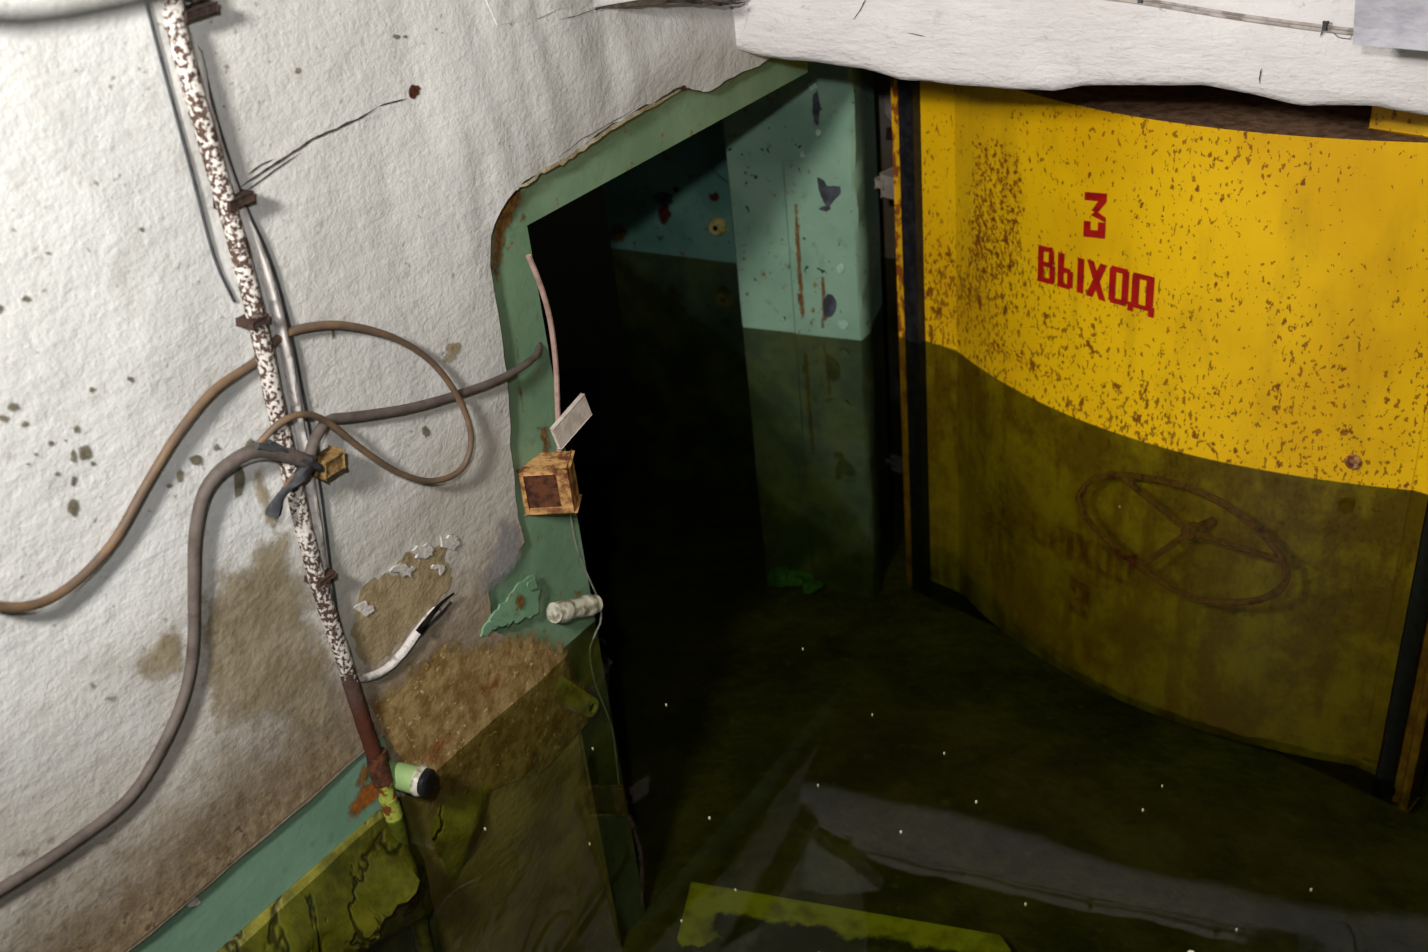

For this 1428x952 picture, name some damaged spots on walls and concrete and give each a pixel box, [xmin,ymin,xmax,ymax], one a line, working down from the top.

crack [241,98,407,190]
leakage [167,444,220,488]
flaking render [350,534,460,665]
peeling [480,574,541,637]
leakage [43,466,587,952]